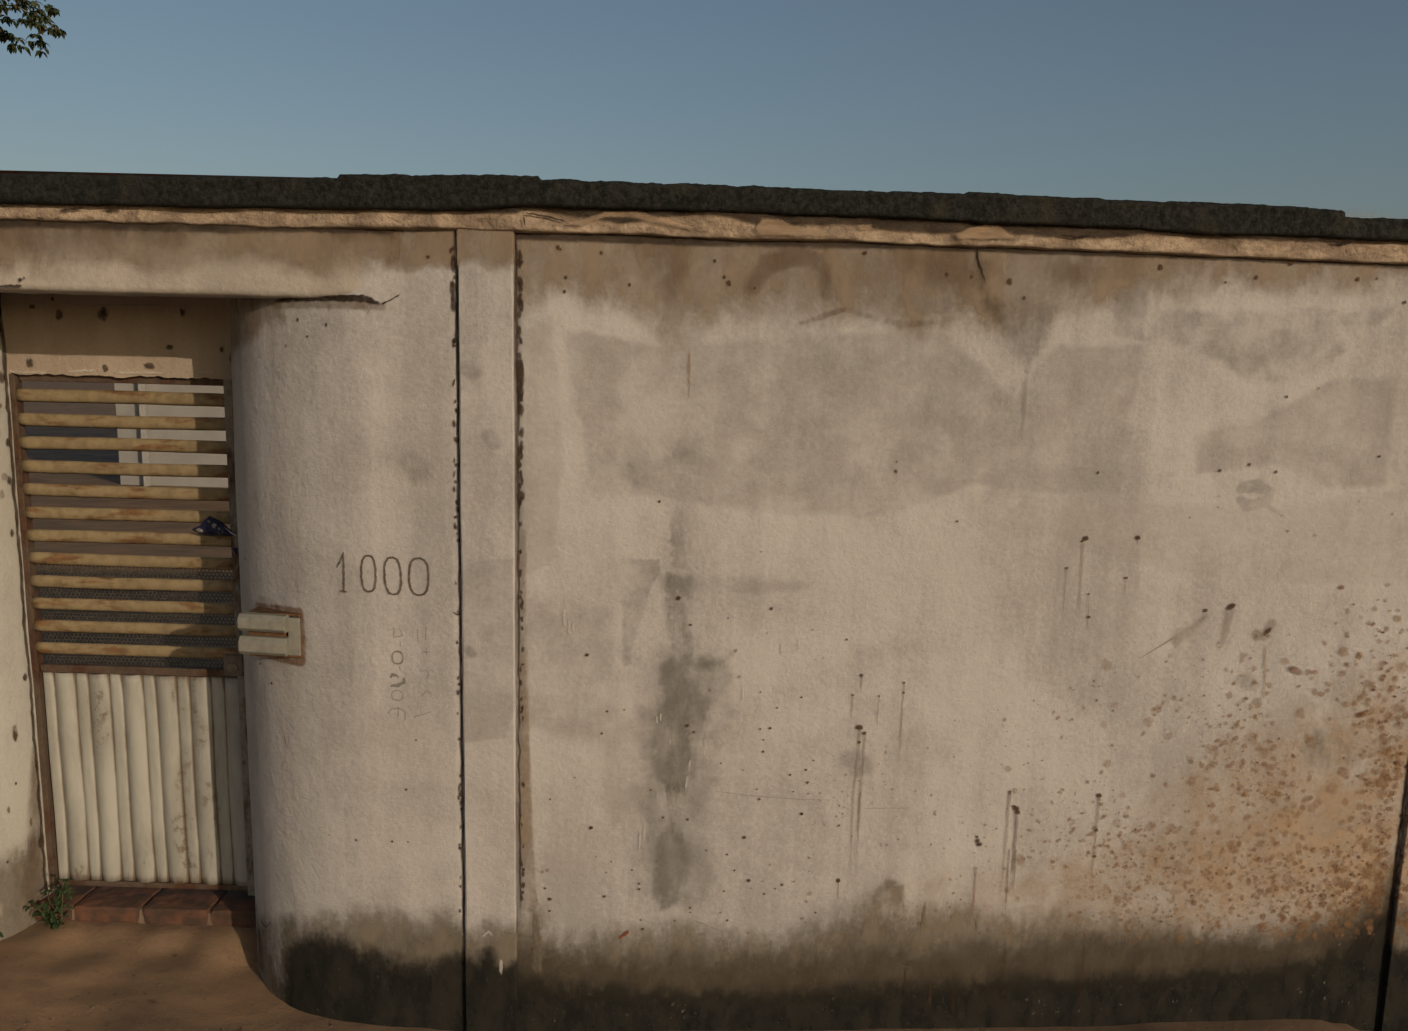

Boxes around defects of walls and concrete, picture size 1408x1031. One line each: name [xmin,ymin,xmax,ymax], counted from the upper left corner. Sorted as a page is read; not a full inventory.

crack [278,294,399,308]
damp [0,220,1408,1031]